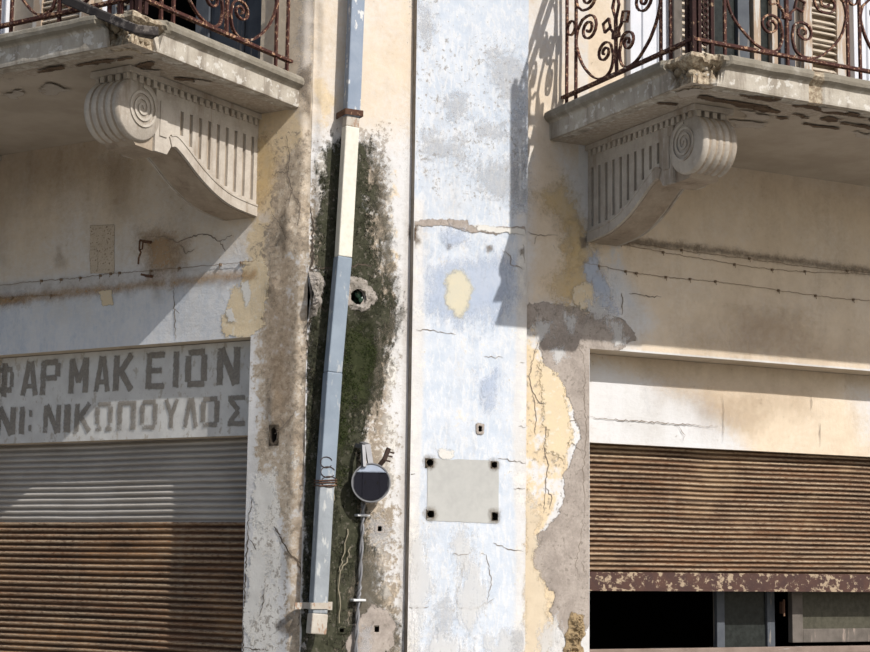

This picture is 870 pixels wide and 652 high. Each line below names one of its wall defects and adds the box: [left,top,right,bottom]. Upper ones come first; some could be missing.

spalling [657,89,870,139]
crack [415,218,555,269]
flaking render [220,254,269,339]
damp [309,308,320,352]
spalling [348,276,378,312]
damp [303,363,316,575]
damp [332,147,407,652]
crack [517,338,552,510]
flaking render [527,290,636,652]
crack [570,348,725,573]
crack [274,527,301,583]
damp [301,586,309,652]